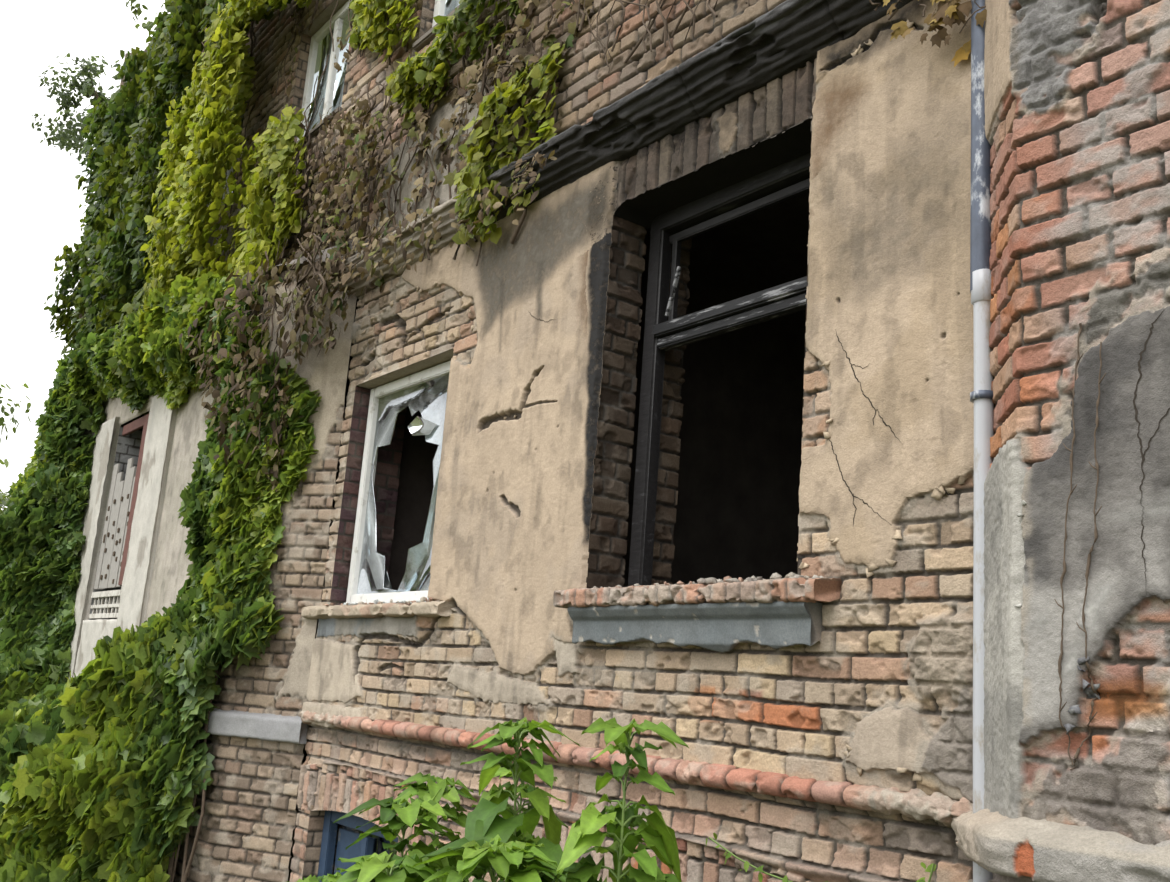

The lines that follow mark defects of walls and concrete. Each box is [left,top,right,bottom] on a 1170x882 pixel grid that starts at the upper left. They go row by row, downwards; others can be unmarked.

crack [480,365,558,429]
crack [835,329,897,438]
crack [829,440,890,525]
crack [1133,310,1170,595]
flaking render [798,438,1170,819]